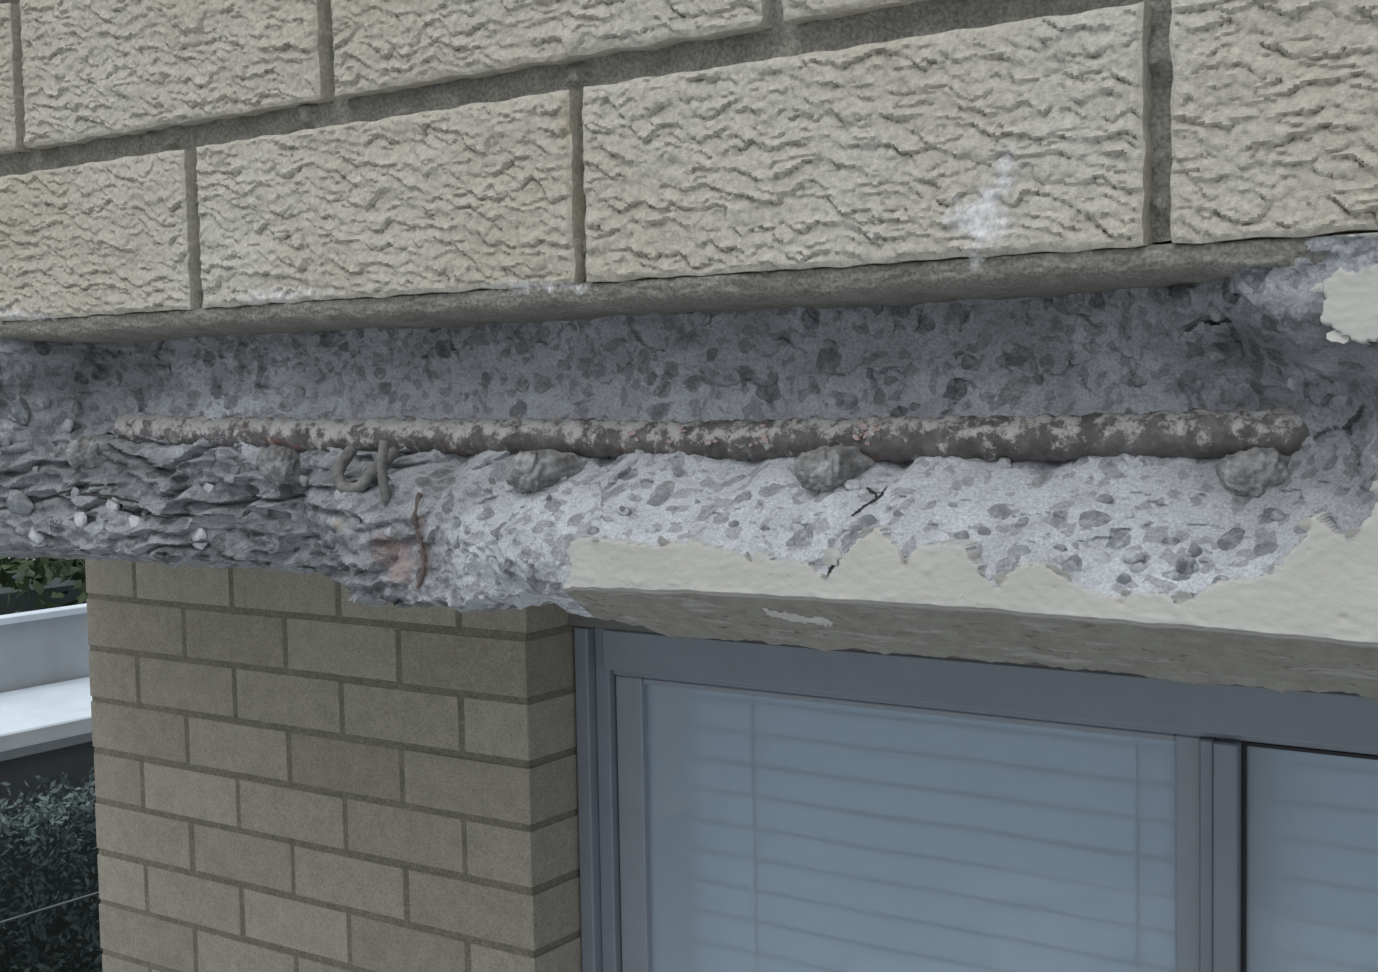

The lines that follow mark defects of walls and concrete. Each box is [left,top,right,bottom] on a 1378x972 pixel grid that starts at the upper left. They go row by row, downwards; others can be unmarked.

spalling [0,235,1378,618]
corrosion [379,519,428,581]
spalling [762,608,833,627]